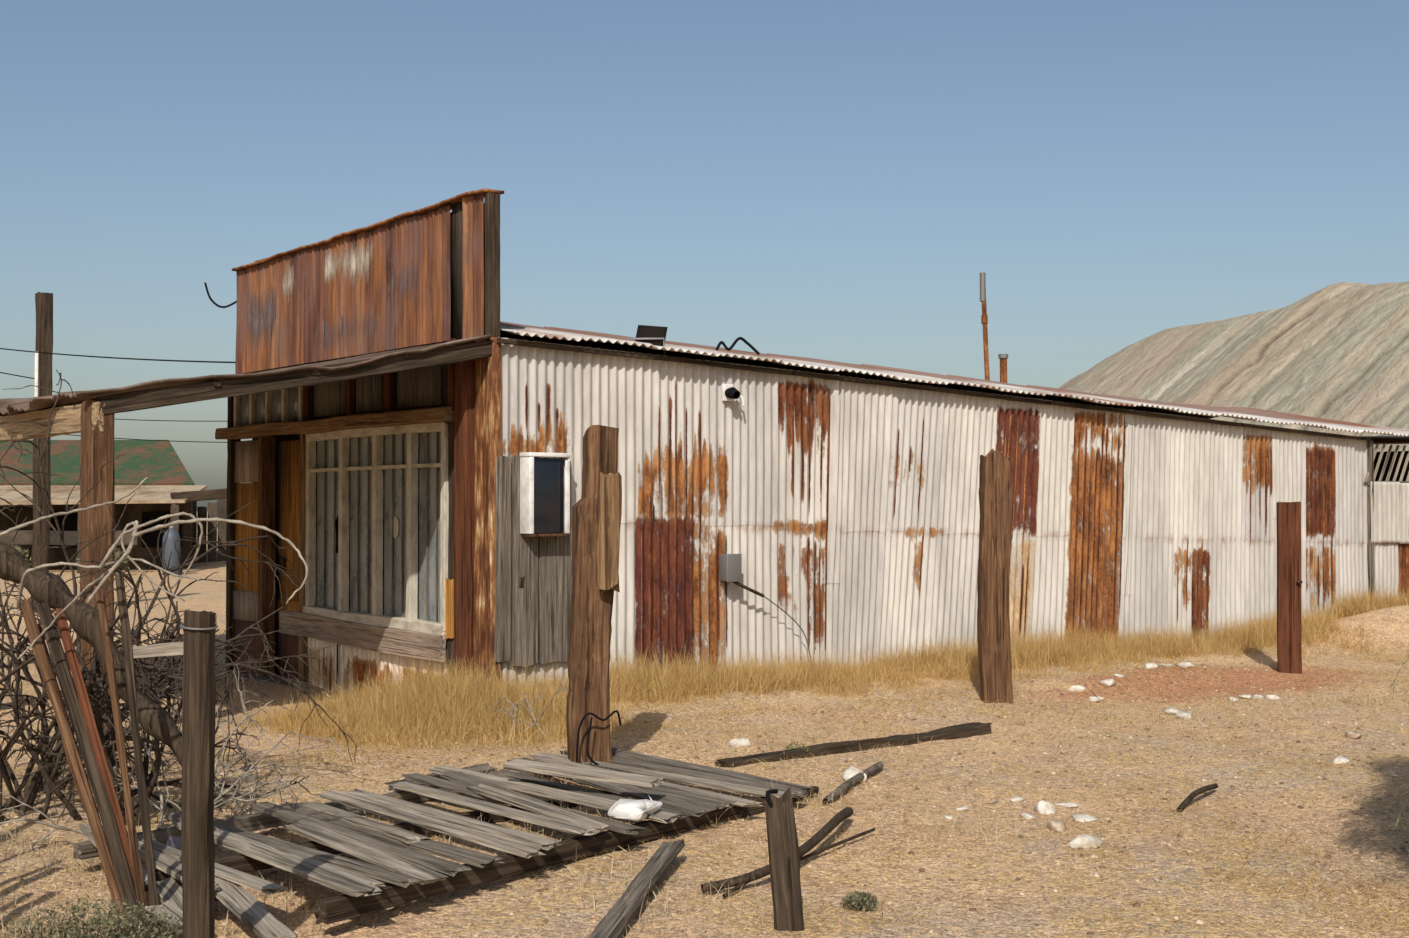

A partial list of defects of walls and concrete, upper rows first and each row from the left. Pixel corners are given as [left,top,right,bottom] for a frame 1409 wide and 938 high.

corrosion [235,193,484,374]
corrosion [635,381,729,673]
corrosion [773,379,831,650]
corrosion [996,405,1040,644]
corrosion [1064,412,1126,642]
corrosion [1175,538,1211,642]
corrosion [1242,434,1273,546]
corrosion [1306,443,1336,610]